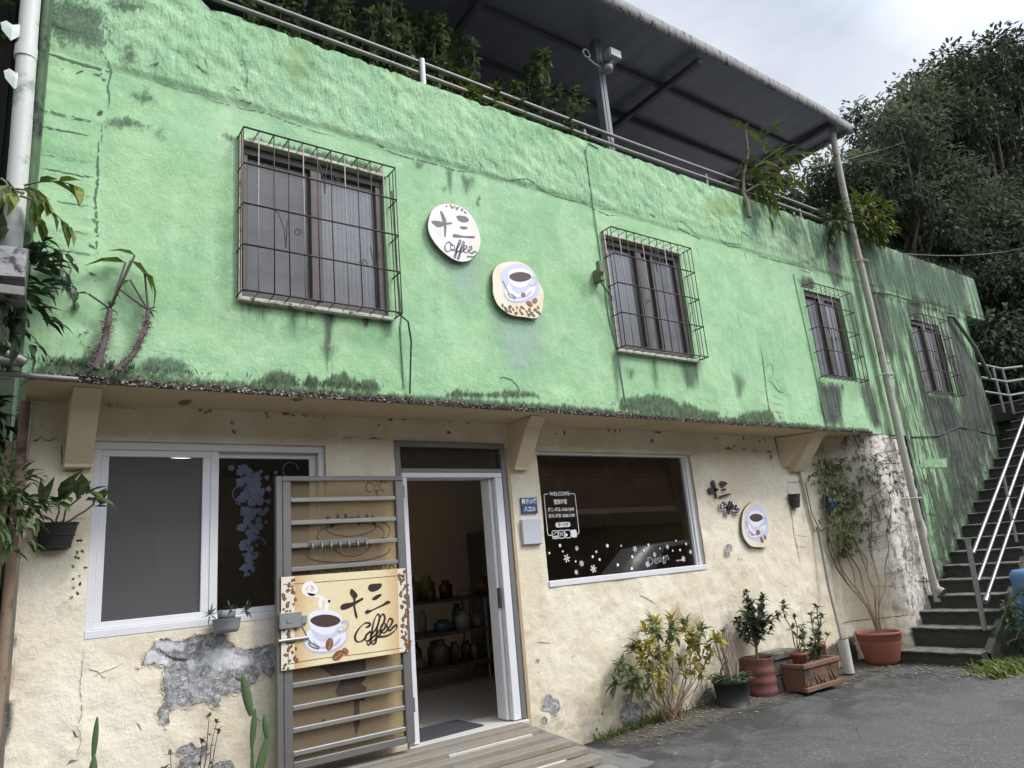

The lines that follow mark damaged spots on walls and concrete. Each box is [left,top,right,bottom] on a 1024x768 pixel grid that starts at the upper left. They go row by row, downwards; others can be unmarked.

crack [39,52,113,298]
crack [377,143,616,215]
leakage [809,227,843,288]
leakage [137,357,194,377]
leakage [683,363,698,385]
leakage [819,381,843,426]
leakage [859,373,880,427]
leakage [871,252,993,543]
peeling [136,630,275,729]
peeling [526,693,561,726]
peeling [173,741,236,768]